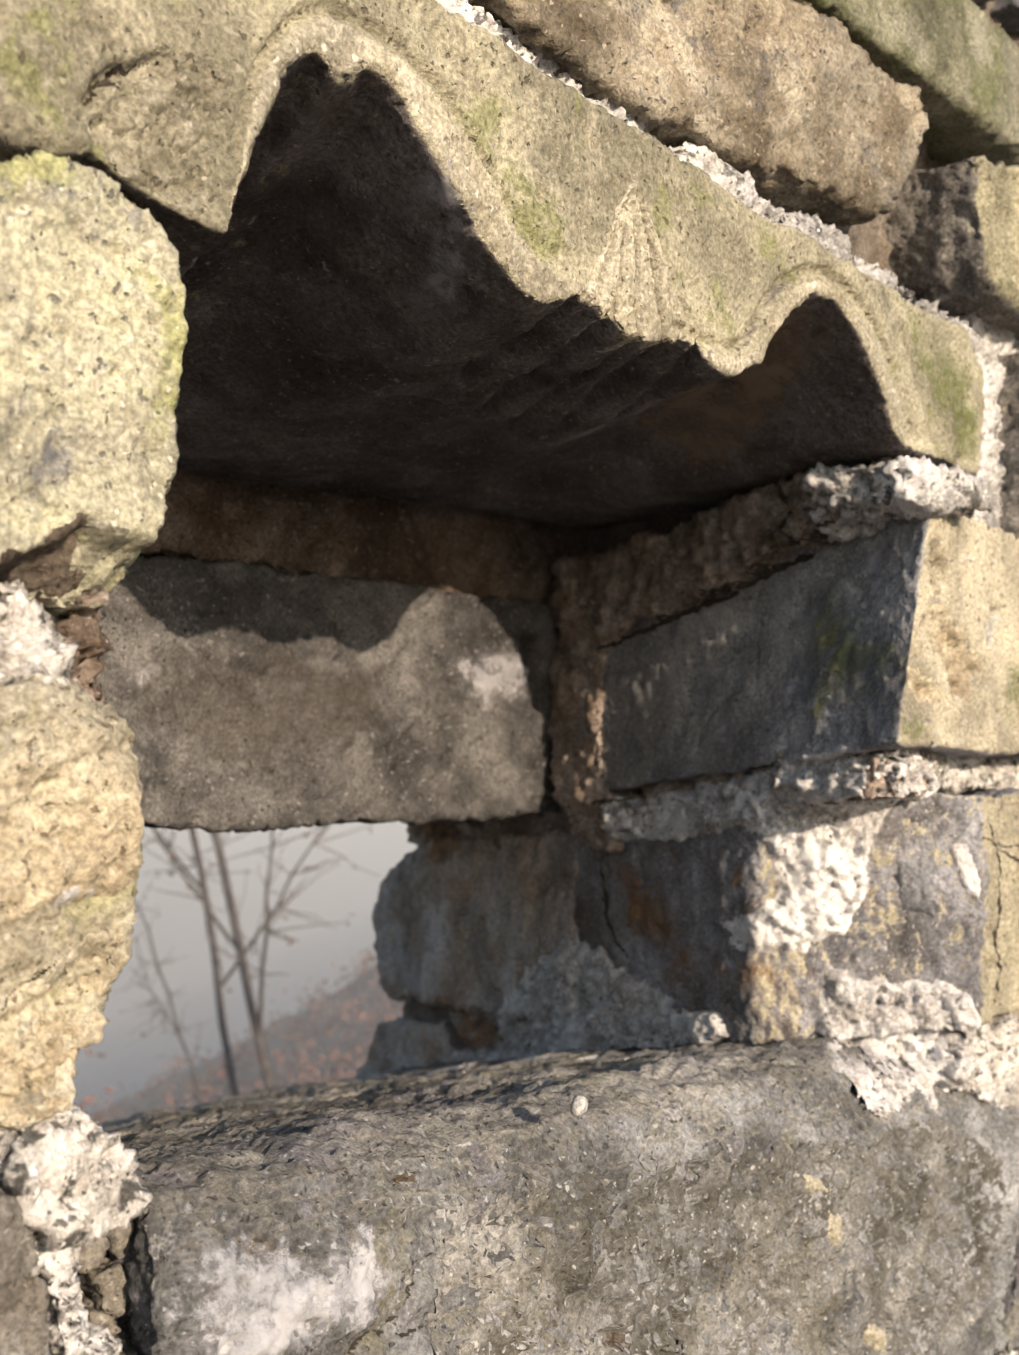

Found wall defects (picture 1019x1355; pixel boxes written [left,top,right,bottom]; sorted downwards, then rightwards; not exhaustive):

crack [983,818,1019,1012]